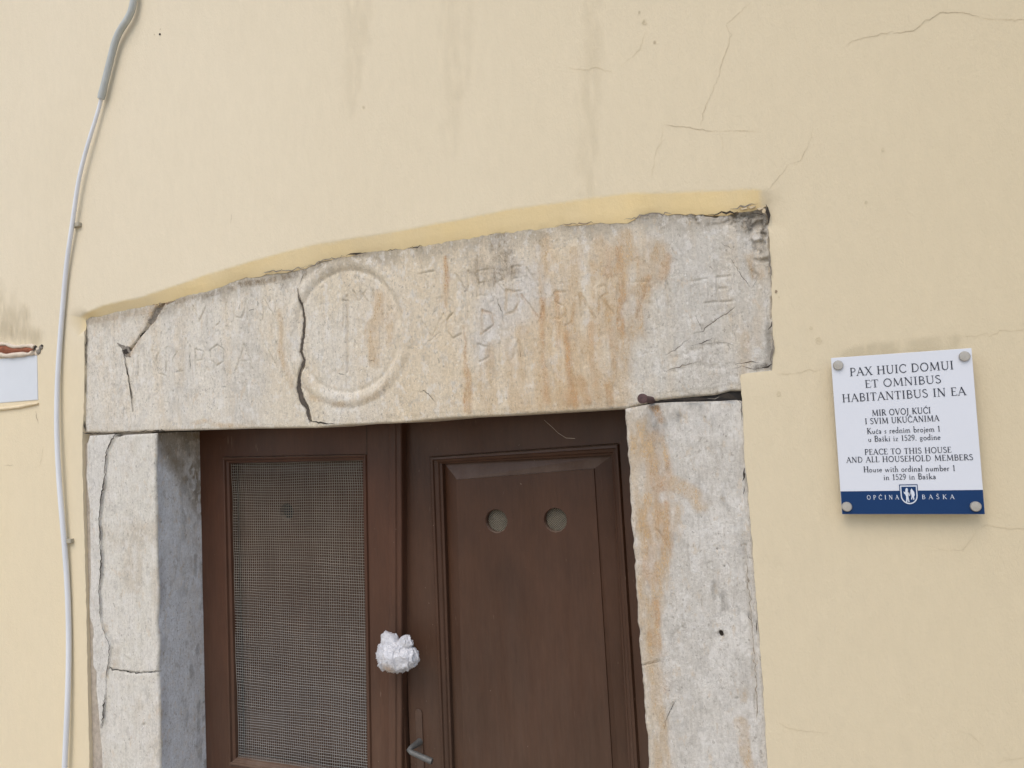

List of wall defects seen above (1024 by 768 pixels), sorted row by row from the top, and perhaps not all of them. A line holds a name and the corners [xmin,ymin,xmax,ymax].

crack [845,12,1018,47]
crack [264,253,363,424]
crack [98,435,159,728]